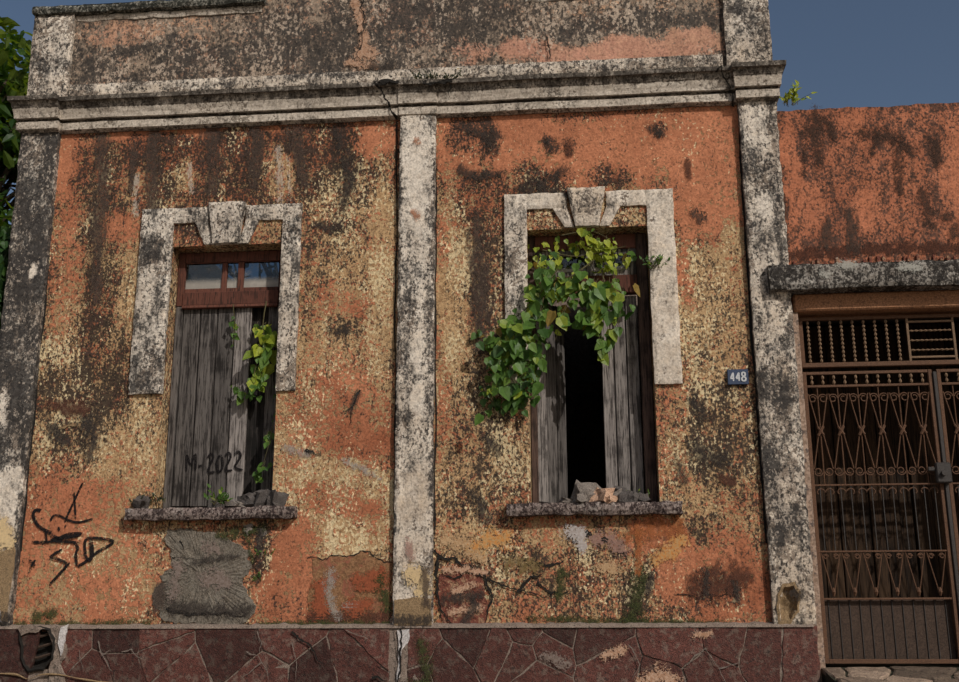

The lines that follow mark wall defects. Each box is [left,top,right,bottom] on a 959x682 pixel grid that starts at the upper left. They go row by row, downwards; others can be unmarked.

leakage [88,132,112,305]
leakage [128,130,163,209]
leakage [455,163,507,184]
leakage [513,137,574,194]
leakage [783,125,959,262]
crack [373,81,398,542]
crack [431,170,439,548]
spalling [0,516,69,682]
flaking render [306,535,554,628]
crack [523,558,568,594]
crack [291,631,324,680]
crack [372,628,402,682]